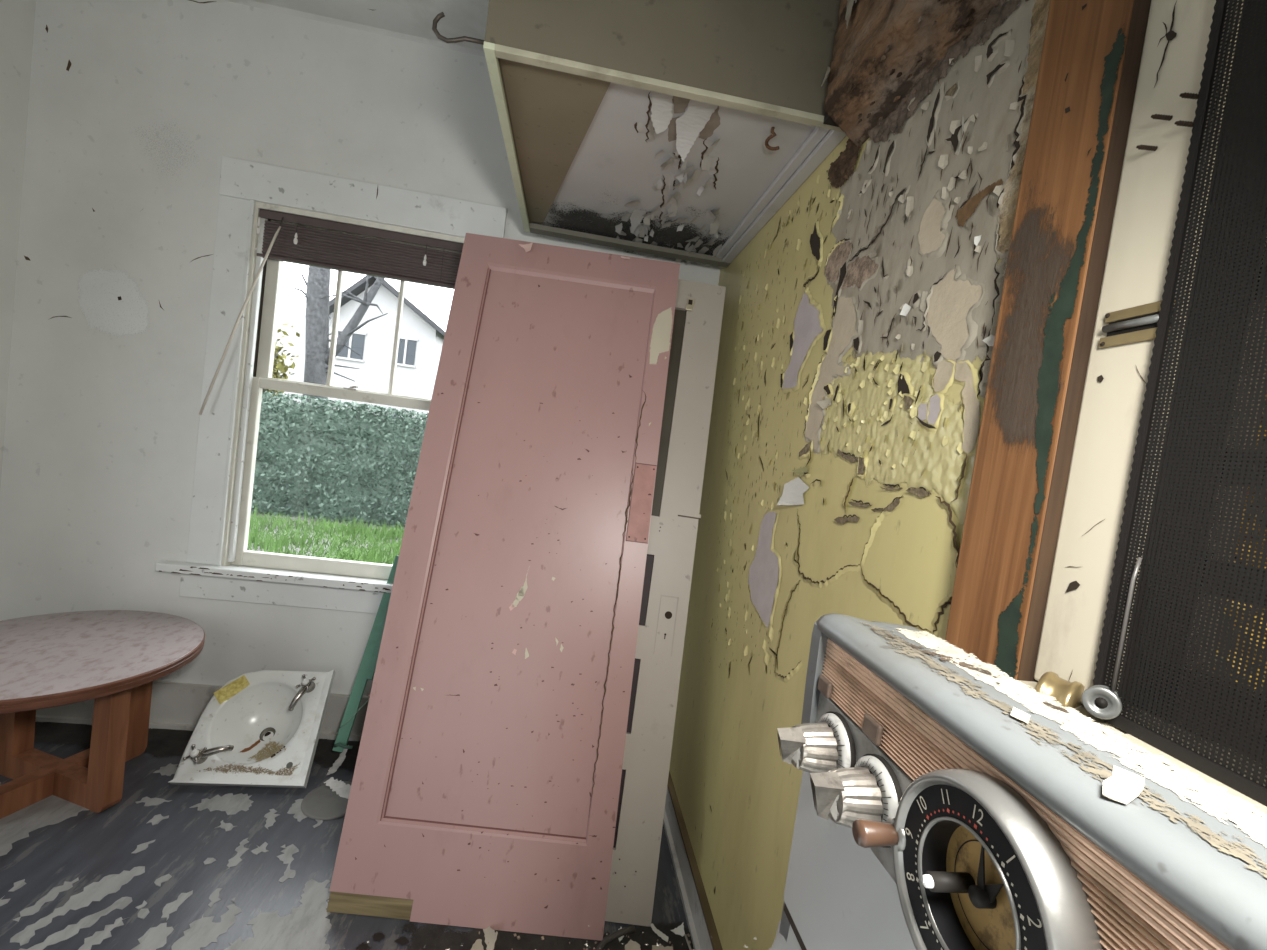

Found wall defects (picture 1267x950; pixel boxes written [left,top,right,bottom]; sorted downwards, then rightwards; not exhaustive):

peeling [615,91,722,267]
crack [711,77,1028,683]
peeling [748,0,1050,631]
leakage [981,163,1077,459]
peeling [0,793,332,950]